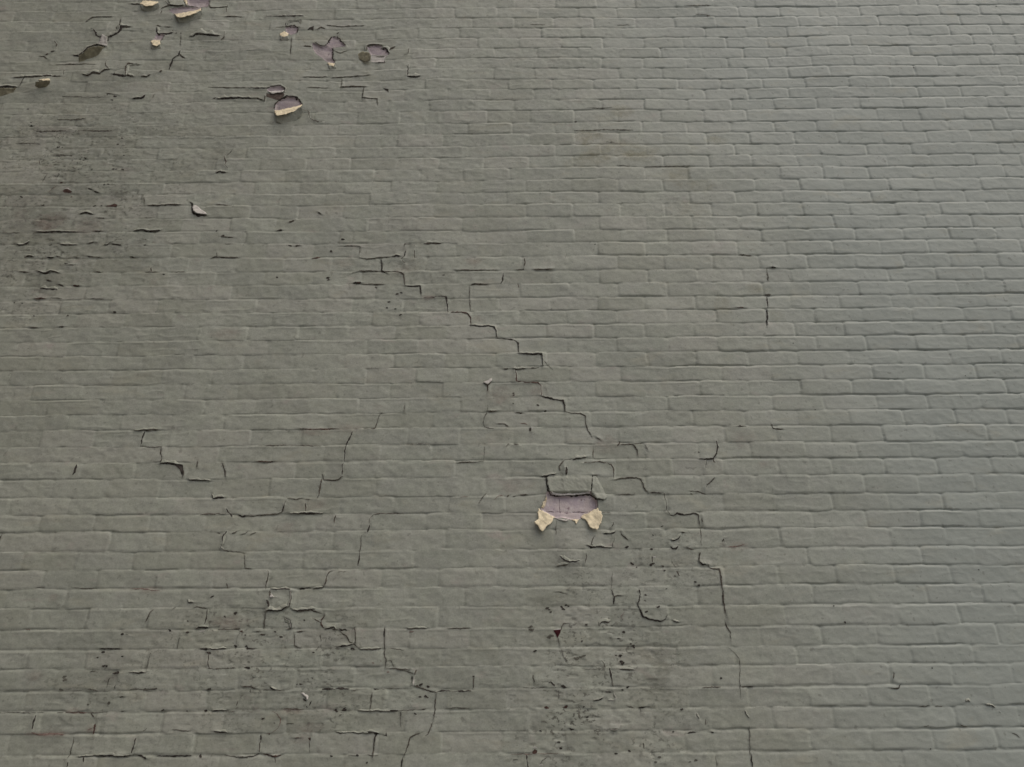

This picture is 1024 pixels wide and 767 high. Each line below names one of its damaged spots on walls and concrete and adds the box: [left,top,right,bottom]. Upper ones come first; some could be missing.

peeling [73,16,131,68]
peeling [132,0,209,50]
peeling [280,20,364,70]
peeling [0,71,64,96]
crack [15,5,238,156]
crack [213,87,262,100]
peeling [248,83,322,124]
crack [306,75,378,105]
crack [739,254,776,325]
crack [344,241,753,767]
peeling [534,455,609,533]
crack [5,417,474,767]